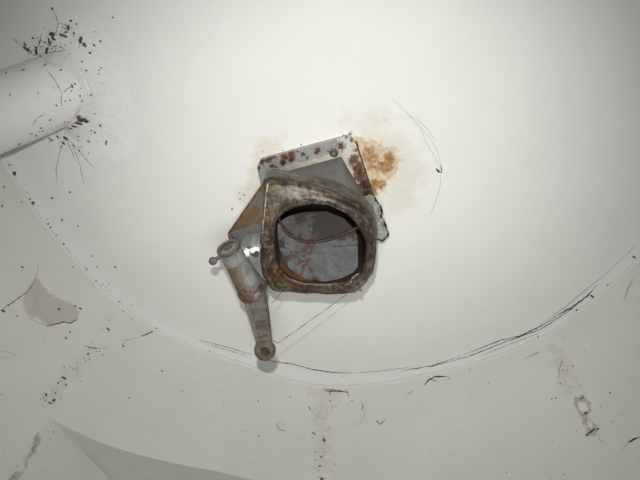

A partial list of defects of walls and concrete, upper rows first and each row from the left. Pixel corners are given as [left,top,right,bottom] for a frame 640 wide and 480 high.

corrosion [353,137,398,196]
crack [397,103,442,215]
crack [360,243,638,394]
crack [200,340,249,357]
crack [269,360,342,373]